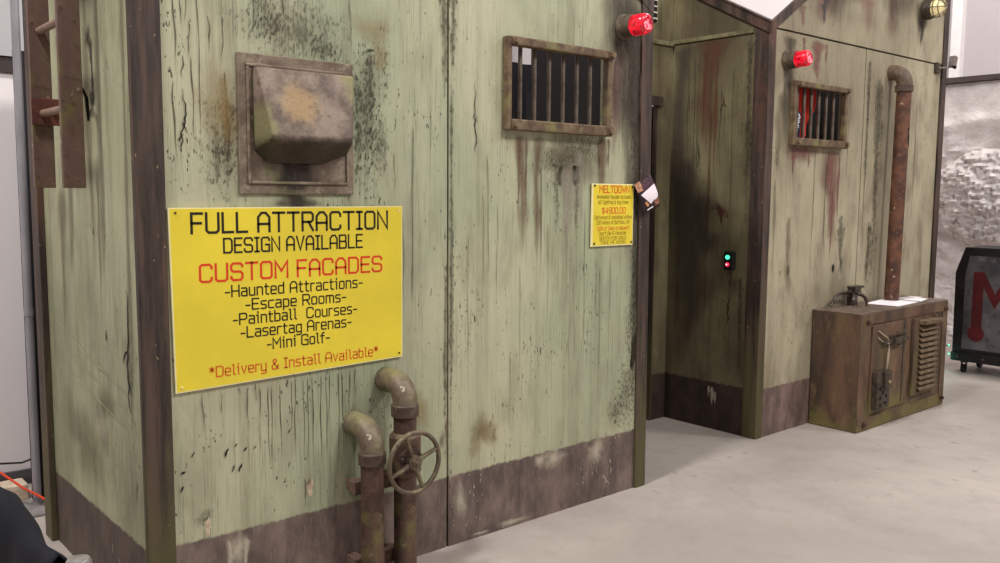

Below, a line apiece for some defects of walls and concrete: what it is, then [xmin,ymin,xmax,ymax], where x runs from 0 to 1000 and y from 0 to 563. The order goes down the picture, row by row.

crack [179,89,188,147]
damp [172,0,210,133]
damp [213,73,236,187]
damp [279,163,313,207]
damp [353,55,396,189]
rust [518,140,542,224]
rust [826,154,840,244]
crack [105,293,132,413]